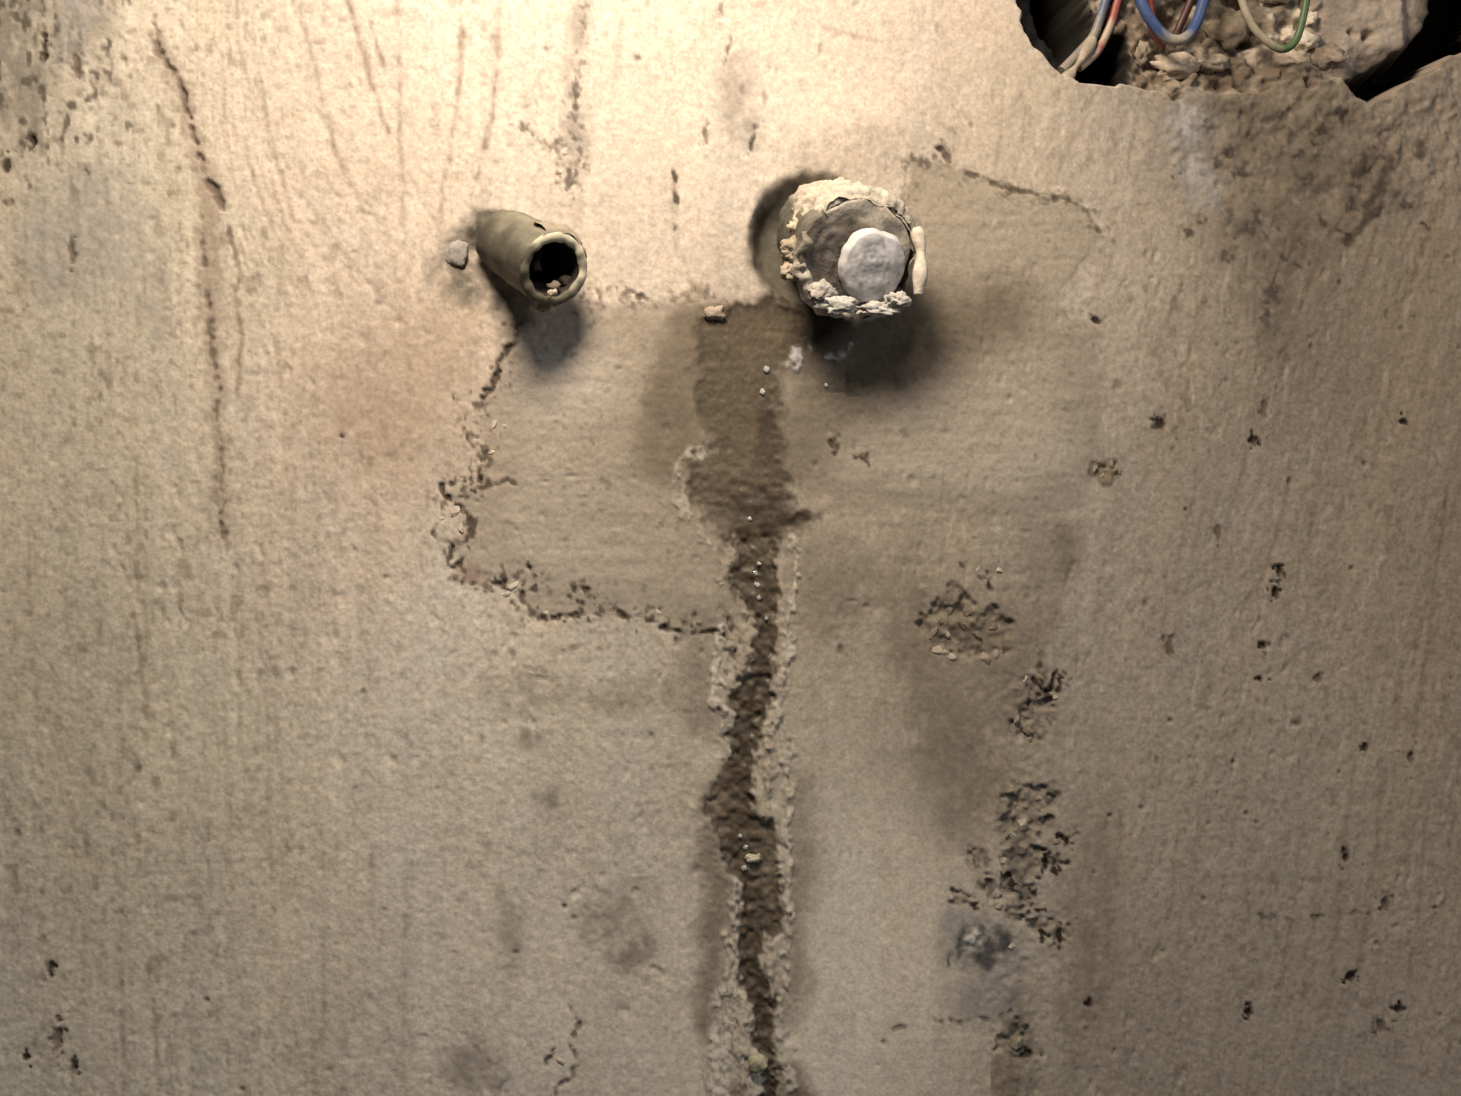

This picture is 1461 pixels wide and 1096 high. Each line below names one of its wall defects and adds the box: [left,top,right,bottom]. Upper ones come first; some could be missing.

hole [1016,0,1461,102]
crack [431,322,741,657]
water stain [646,175,1011,1096]
spalling [918,594,1013,665]
spalling [1009,695,1054,740]
spalling [950,784,1074,949]
spalling [996,1018,1032,1058]